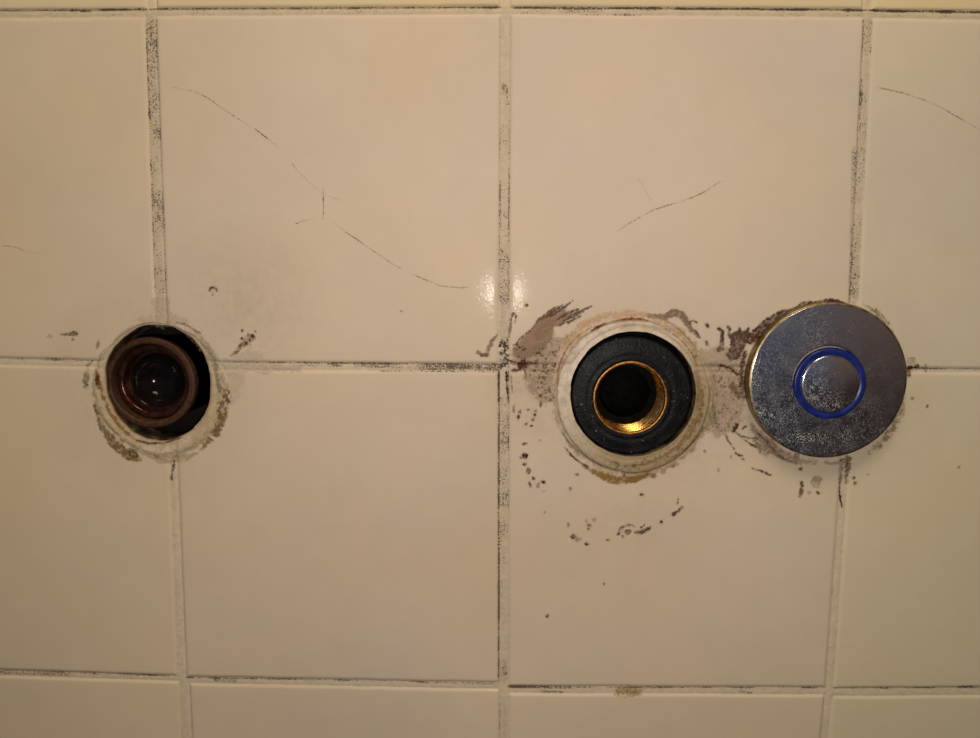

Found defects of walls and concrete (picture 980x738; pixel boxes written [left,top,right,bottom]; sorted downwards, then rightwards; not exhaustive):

damp [494,302,592,402]
damp [709,351,747,398]
rust [94,372,179,461]
rust [202,384,230,448]
damp [839,456,856,507]